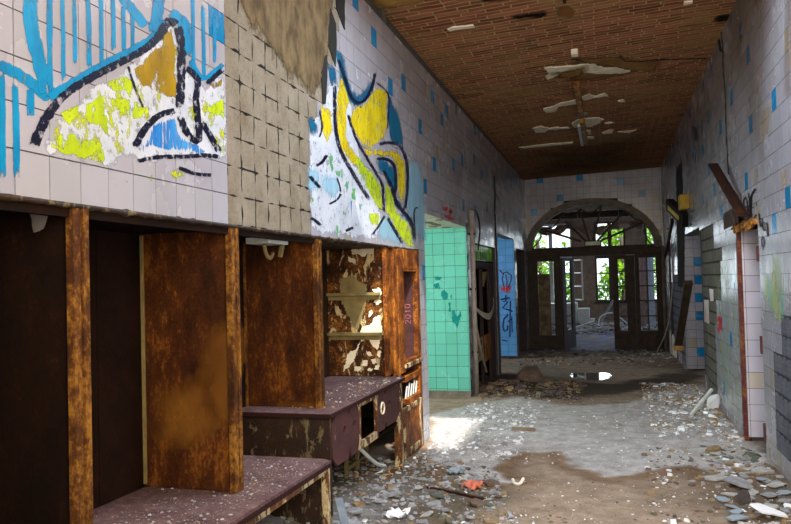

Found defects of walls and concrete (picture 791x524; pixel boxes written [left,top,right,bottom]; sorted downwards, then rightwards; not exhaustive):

peeling [544,64,630,80]
peeling [543,92,608,113]
spalling [223,0,339,235]
peeling [532,117,636,139]
peeling [348,248,374,263]
peeling [340,275,382,372]